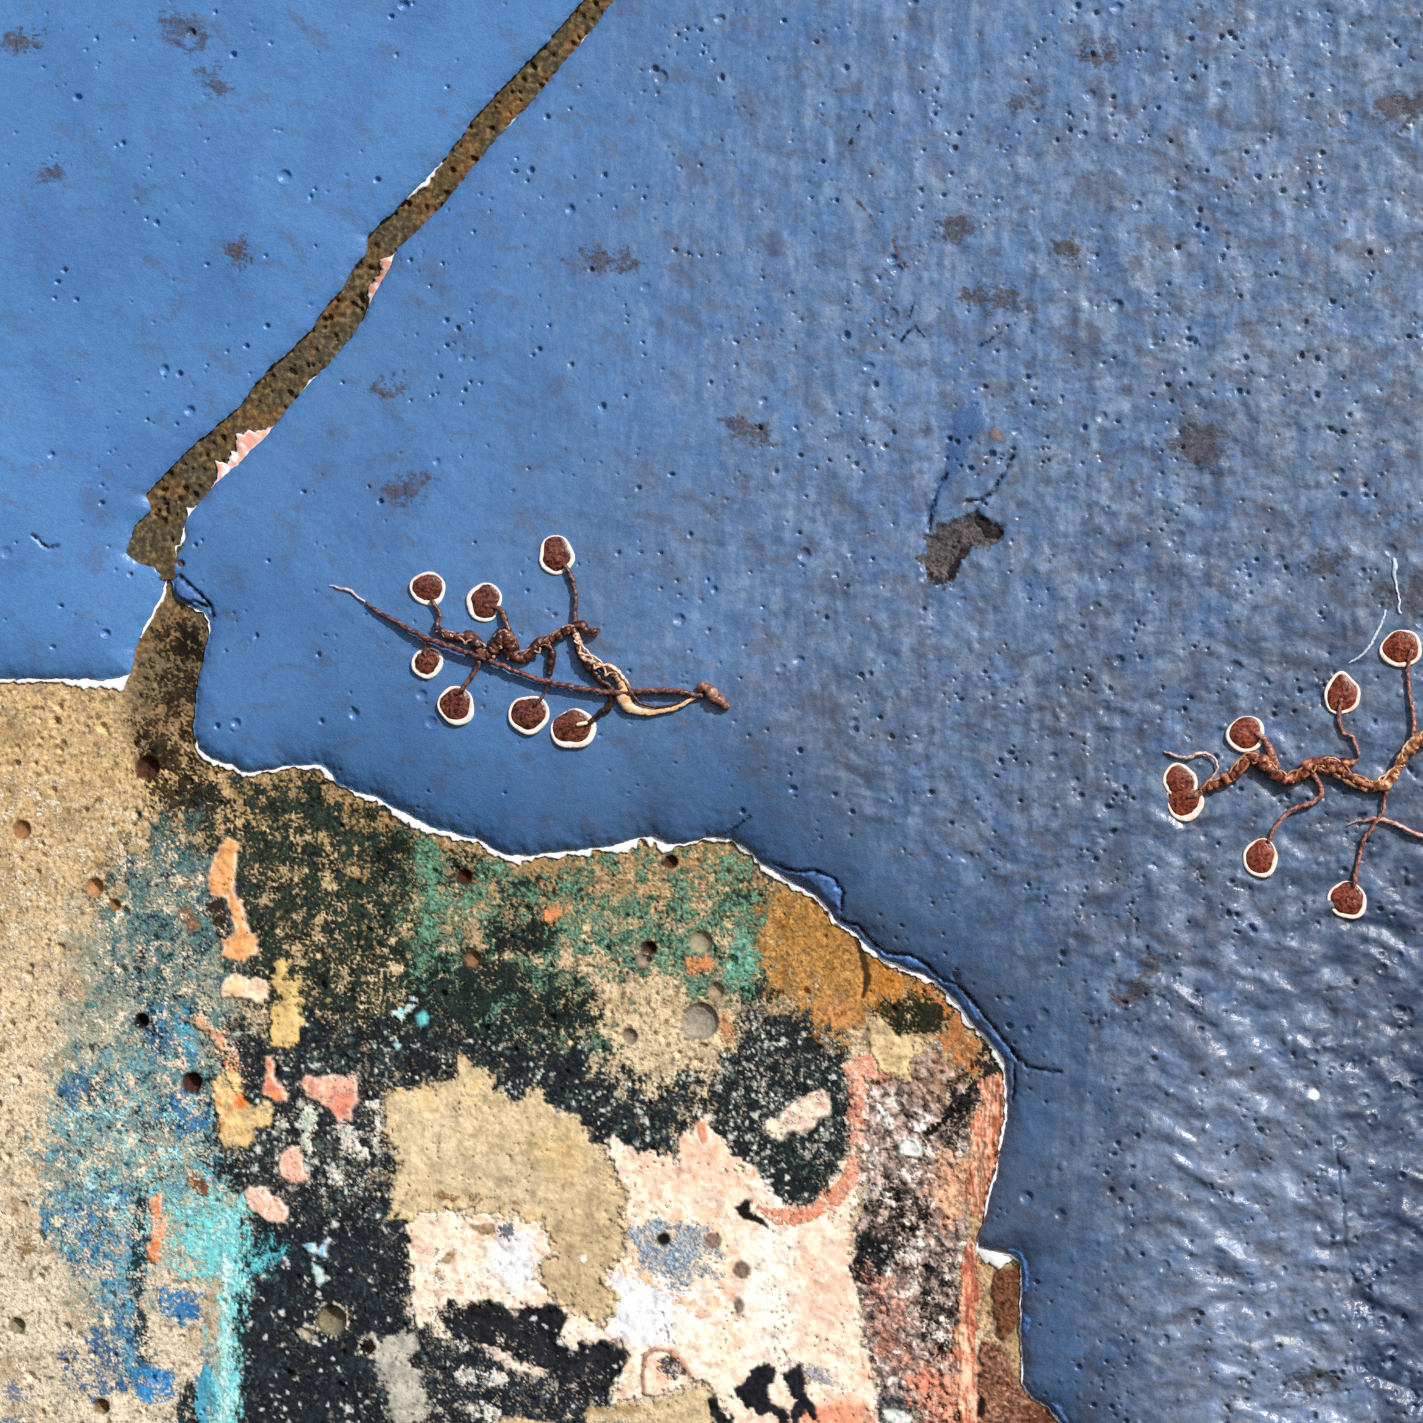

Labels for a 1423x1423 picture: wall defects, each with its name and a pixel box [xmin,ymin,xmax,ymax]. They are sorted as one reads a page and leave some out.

peeling [989,426,1003,442]
peeling [915,508,1007,590]
peeling [0,579,1068,1423]